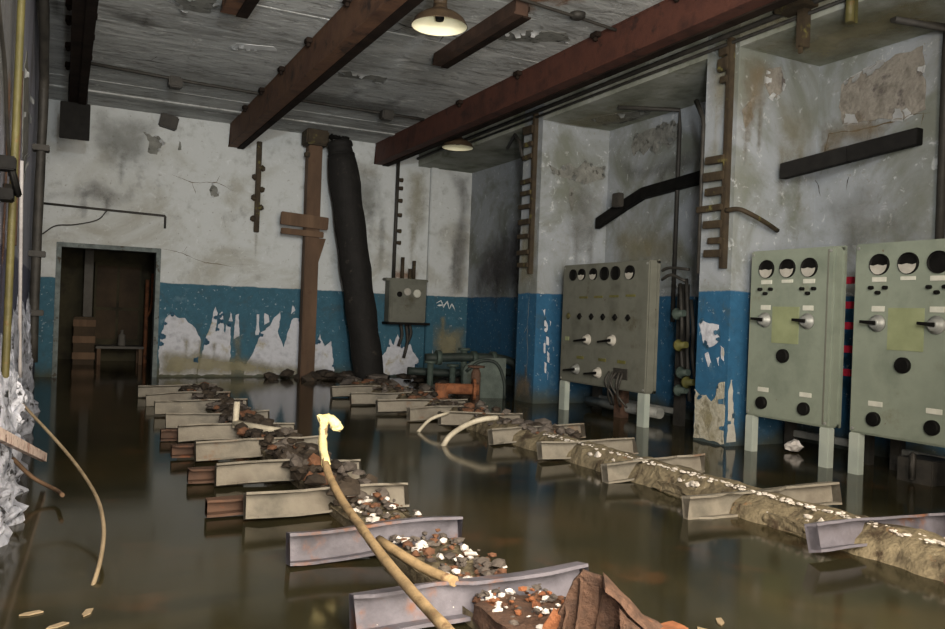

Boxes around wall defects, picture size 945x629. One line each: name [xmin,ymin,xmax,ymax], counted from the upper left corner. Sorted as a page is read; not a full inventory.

peeling [170,0,220,13]
spalling [839,45,926,127]
peeling [158,307,240,376]
peeling [244,306,300,375]
peeling [314,336,335,372]
peeling [382,335,419,375]
peeling [543,309,551,380]
peeling [699,318,724,367]
spalling [693,380,736,445]